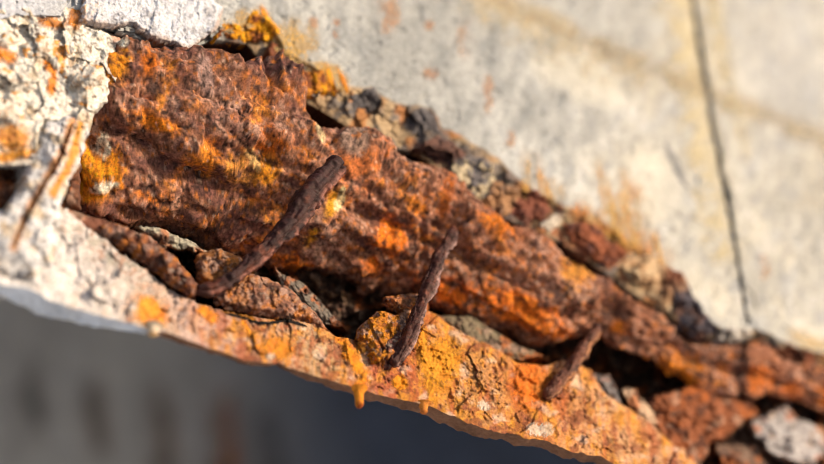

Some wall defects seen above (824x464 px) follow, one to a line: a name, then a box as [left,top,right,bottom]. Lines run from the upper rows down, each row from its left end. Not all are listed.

corrosion [44,60,57,95]
corrosion [38,8,81,29]
spalling [0,0,224,212]
corrosion [209,7,349,100]
spalling [340,87,383,118]
spalling [406,107,465,173]
crack [681,0,758,326]
corrosion [131,294,166,338]
spalling [0,156,824,464]
corrosion [335,335,368,409]
corrosion [418,328,461,415]
corrosion [508,361,550,408]